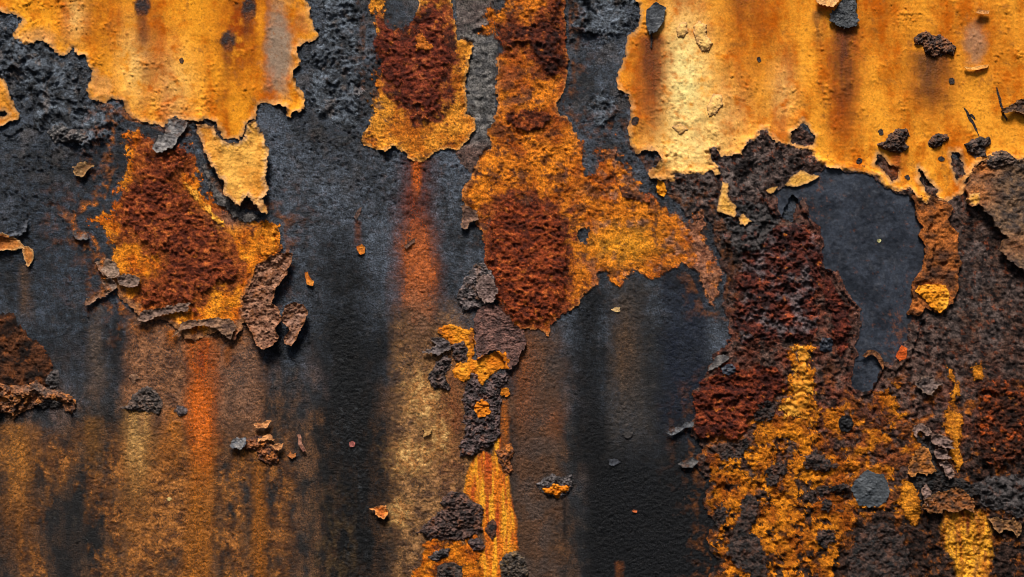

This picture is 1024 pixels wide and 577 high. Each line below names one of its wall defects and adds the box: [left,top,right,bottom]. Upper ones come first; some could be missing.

corrosion [134,0,150,37]
peeling [0,0,319,223]
corrosion [221,0,256,58]
peeling [616,0,1024,226]
corrosion [0,115,308,577]
damp [321,266,384,577]
spalling [485,519,497,540]
damp [574,285,715,577]
corrosion [361,0,1024,577]